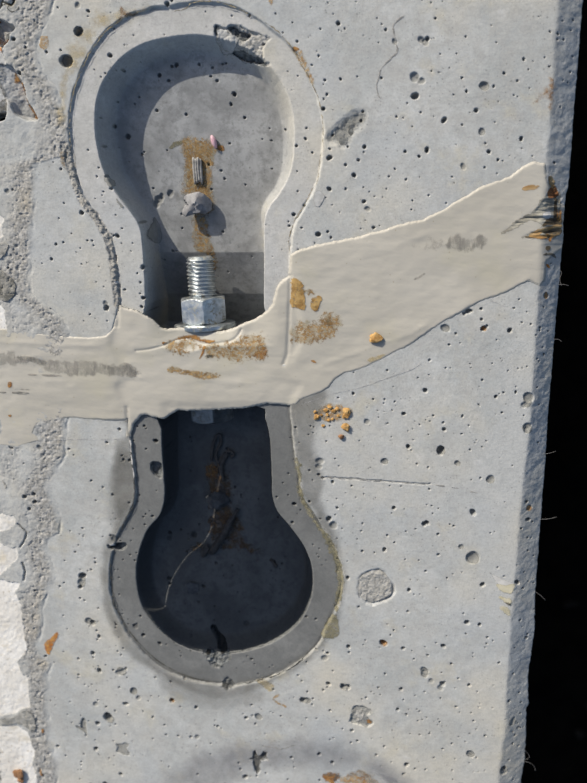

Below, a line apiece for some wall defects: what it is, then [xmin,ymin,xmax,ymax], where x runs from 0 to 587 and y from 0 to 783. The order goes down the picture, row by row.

spalling [214,25,270,66]
spalling [0,20,38,120]
corrosion [169,137,224,269]
spalling [501,176,563,258]
corrosion [162,335,267,362]
corrosion [167,367,220,380]
corrosion [44,632,58,655]
corrosion [323,771,376,783]